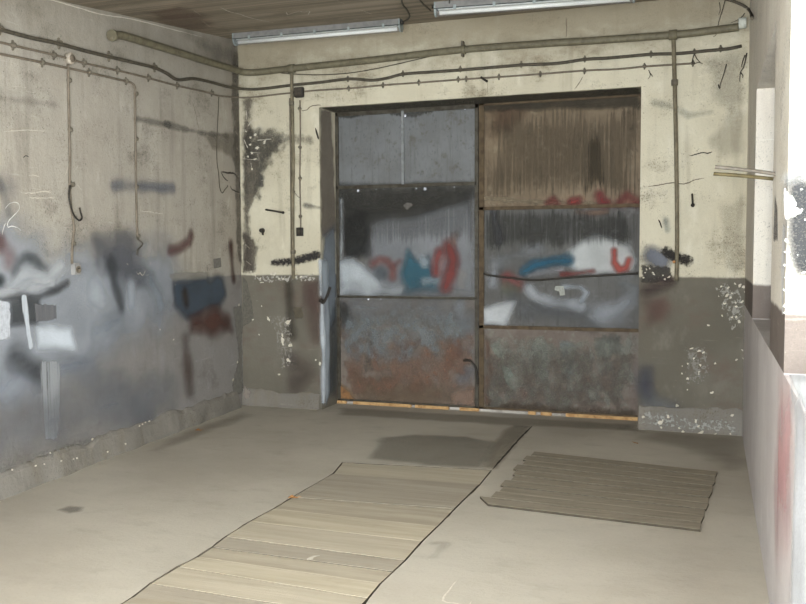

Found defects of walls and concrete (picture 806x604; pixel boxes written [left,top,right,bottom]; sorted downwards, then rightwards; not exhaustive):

peeling [642,404,736,435]